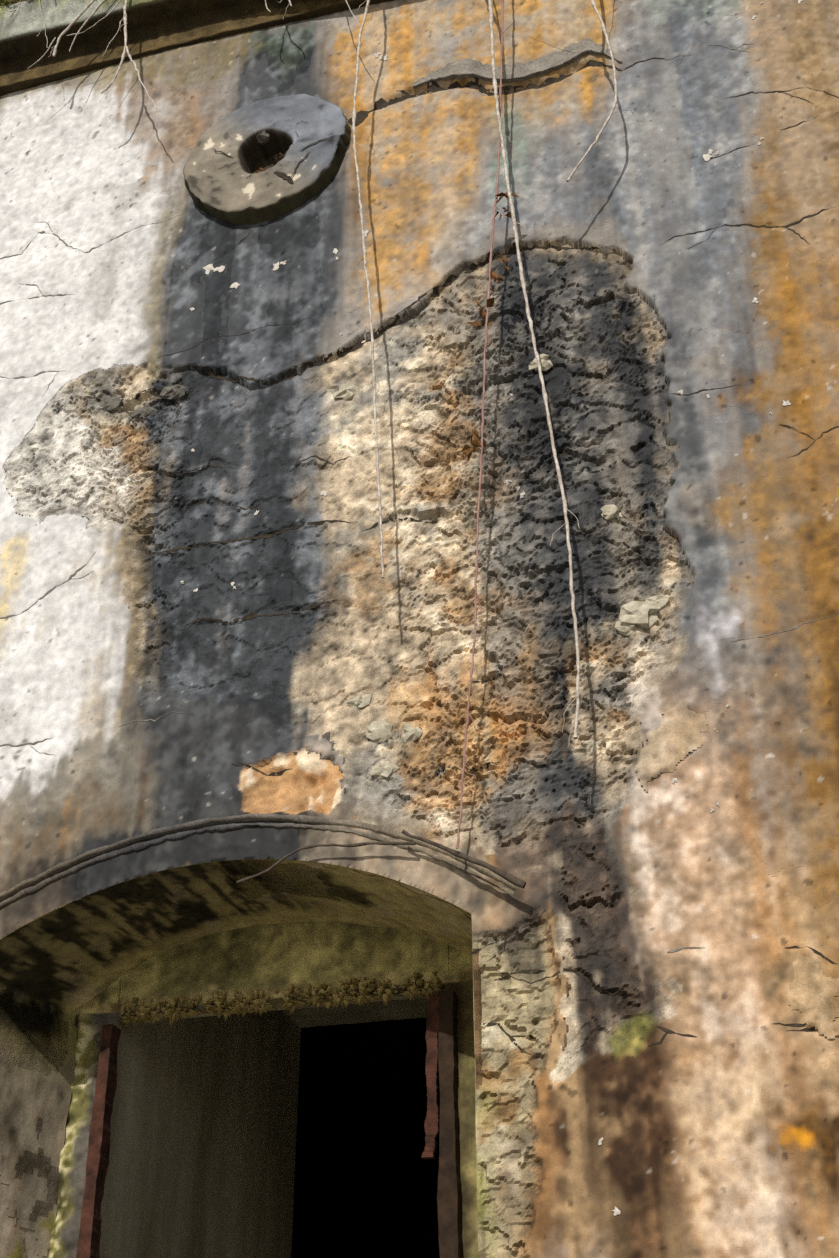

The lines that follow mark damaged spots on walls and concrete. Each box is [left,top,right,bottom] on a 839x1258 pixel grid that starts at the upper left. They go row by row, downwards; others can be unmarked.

crack [0,213,183,304]
rust [336,0,617,336]
crack [274,43,755,183]
crack [664,206,837,249]
spalling [3,364,236,527]
leakage [0,12,513,1077]
spalling [135,304,500,840]
spalling [601,504,622,523]
spalling [615,595,673,639]
rust [682,105,839,979]
crack [772,1023,818,1031]
rust [494,961,839,1258]